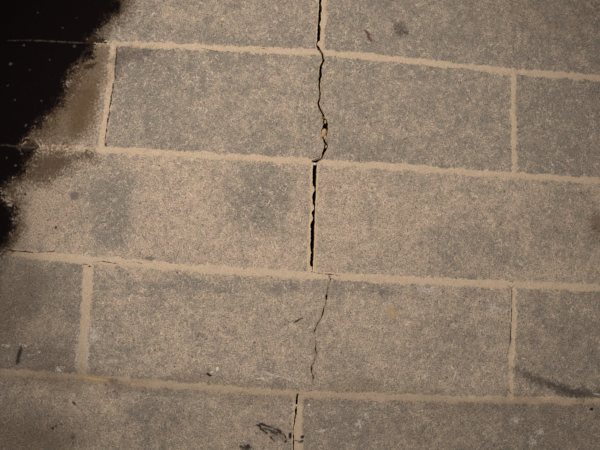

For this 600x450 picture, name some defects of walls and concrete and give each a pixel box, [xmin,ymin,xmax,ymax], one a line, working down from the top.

crack [308,0,334,386]
crack [291,394,299,450]